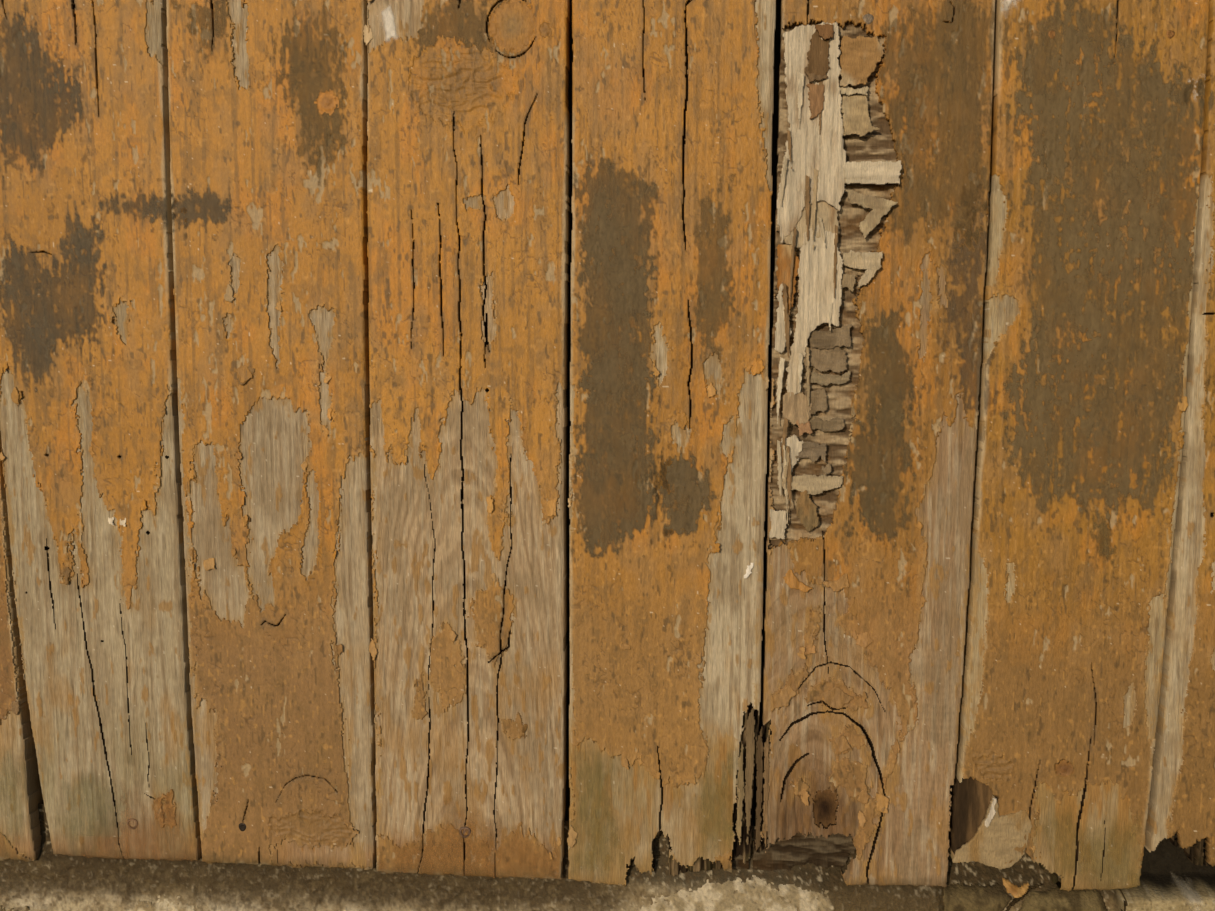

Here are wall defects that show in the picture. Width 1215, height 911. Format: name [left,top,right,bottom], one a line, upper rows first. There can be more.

damp [0,7,83,178]
crack [47,550,152,857]
damp [0,189,231,392]
crack [411,112,512,874]
peeling [0,297,990,887]
damp [573,158,717,557]
crack [682,0,692,250]
crack [779,531,885,883]
peeling [804,24,885,137]
spalling [985,798,997,828]
damp [1003,0,1213,564]
peeling [1031,174,1215,892]